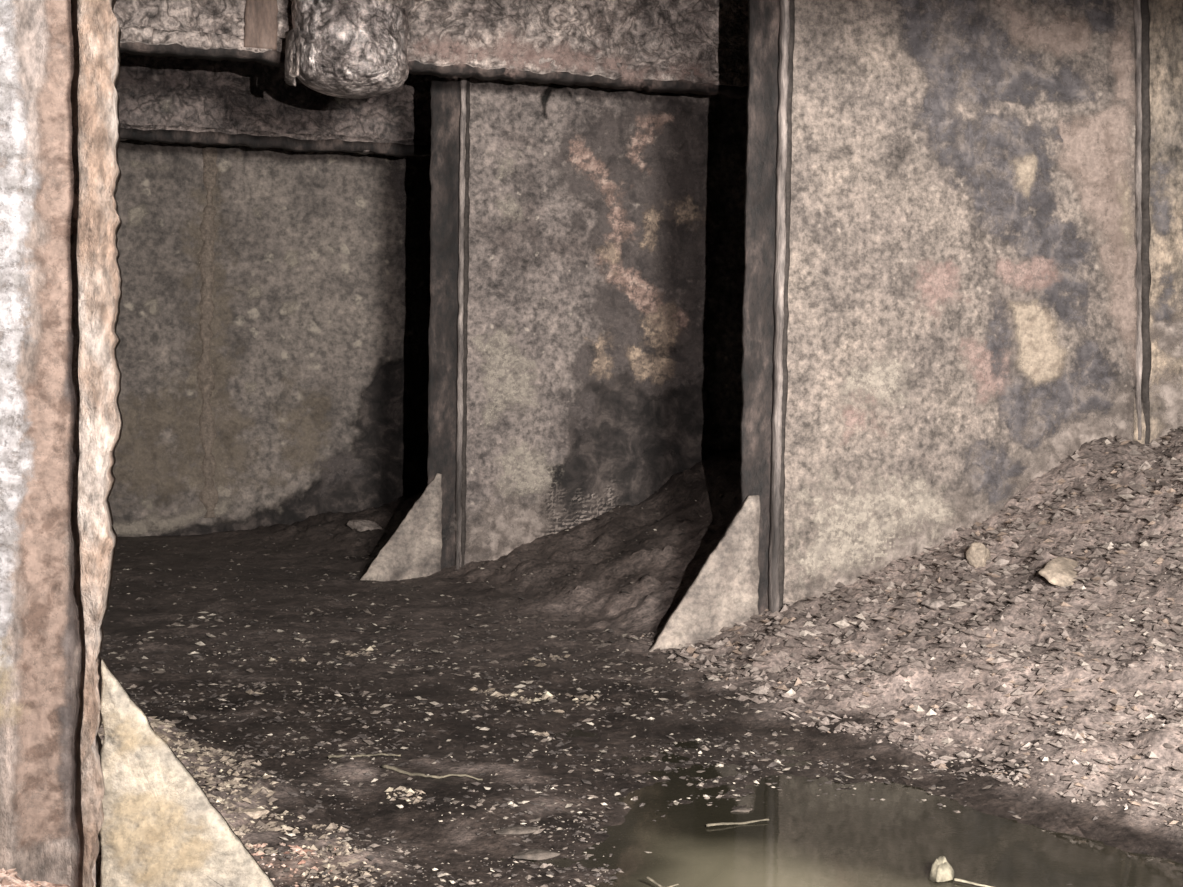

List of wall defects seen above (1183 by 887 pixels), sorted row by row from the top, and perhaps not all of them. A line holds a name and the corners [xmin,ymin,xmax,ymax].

leakage [465,97,727,563]
leakage [795,0,1133,598]